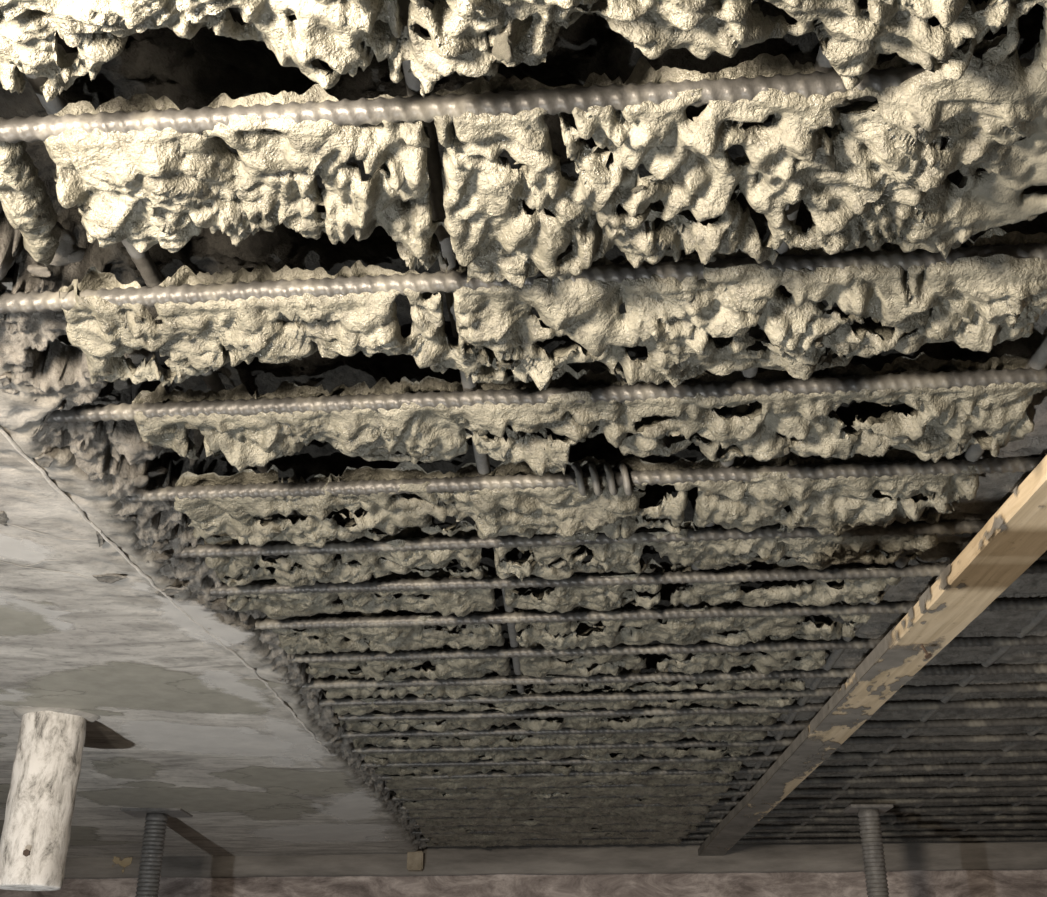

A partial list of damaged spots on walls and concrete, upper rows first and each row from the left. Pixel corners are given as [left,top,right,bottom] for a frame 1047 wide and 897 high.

spalling [62,26,408,110]
spalling [430,0,822,94]
spalling [543,112,613,178]
spalling [0,141,147,295]
spalling [148,223,441,280]
spalling [531,309,648,382]
spalling [850,310,1047,372]
spalling [504,425,706,466]
spalling [833,400,913,430]
spalling [634,484,698,522]
spalling [0,310,502,850]
spalling [681,471,1047,839]